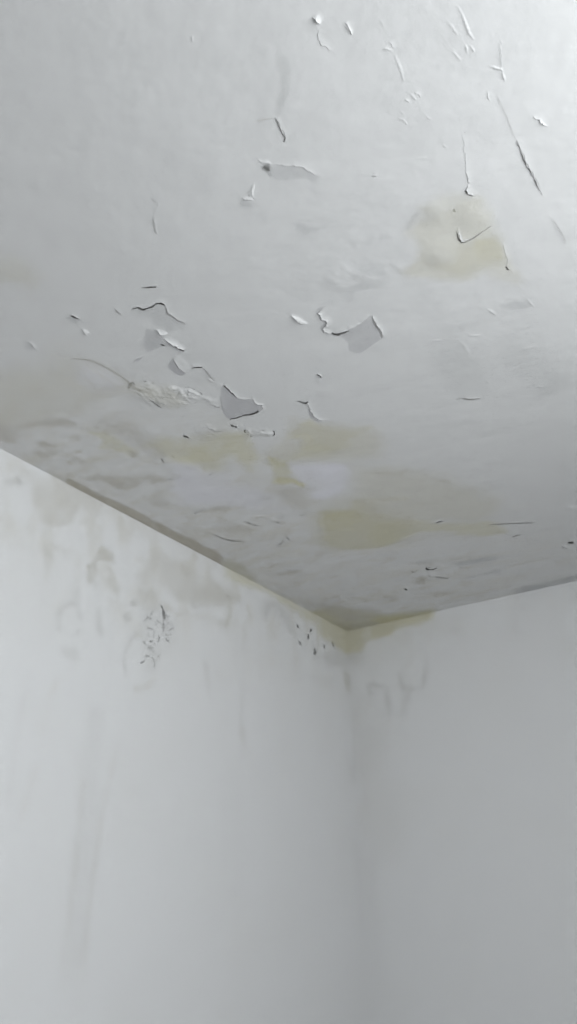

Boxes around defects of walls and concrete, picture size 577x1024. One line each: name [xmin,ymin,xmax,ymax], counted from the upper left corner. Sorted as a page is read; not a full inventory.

spalling [256,154,321,177]
crack [496,93,566,247]
crack [131,282,187,324]
spalling [126,328,266,422]
peeling [316,307,388,353]
water stain [270,458,412,549]